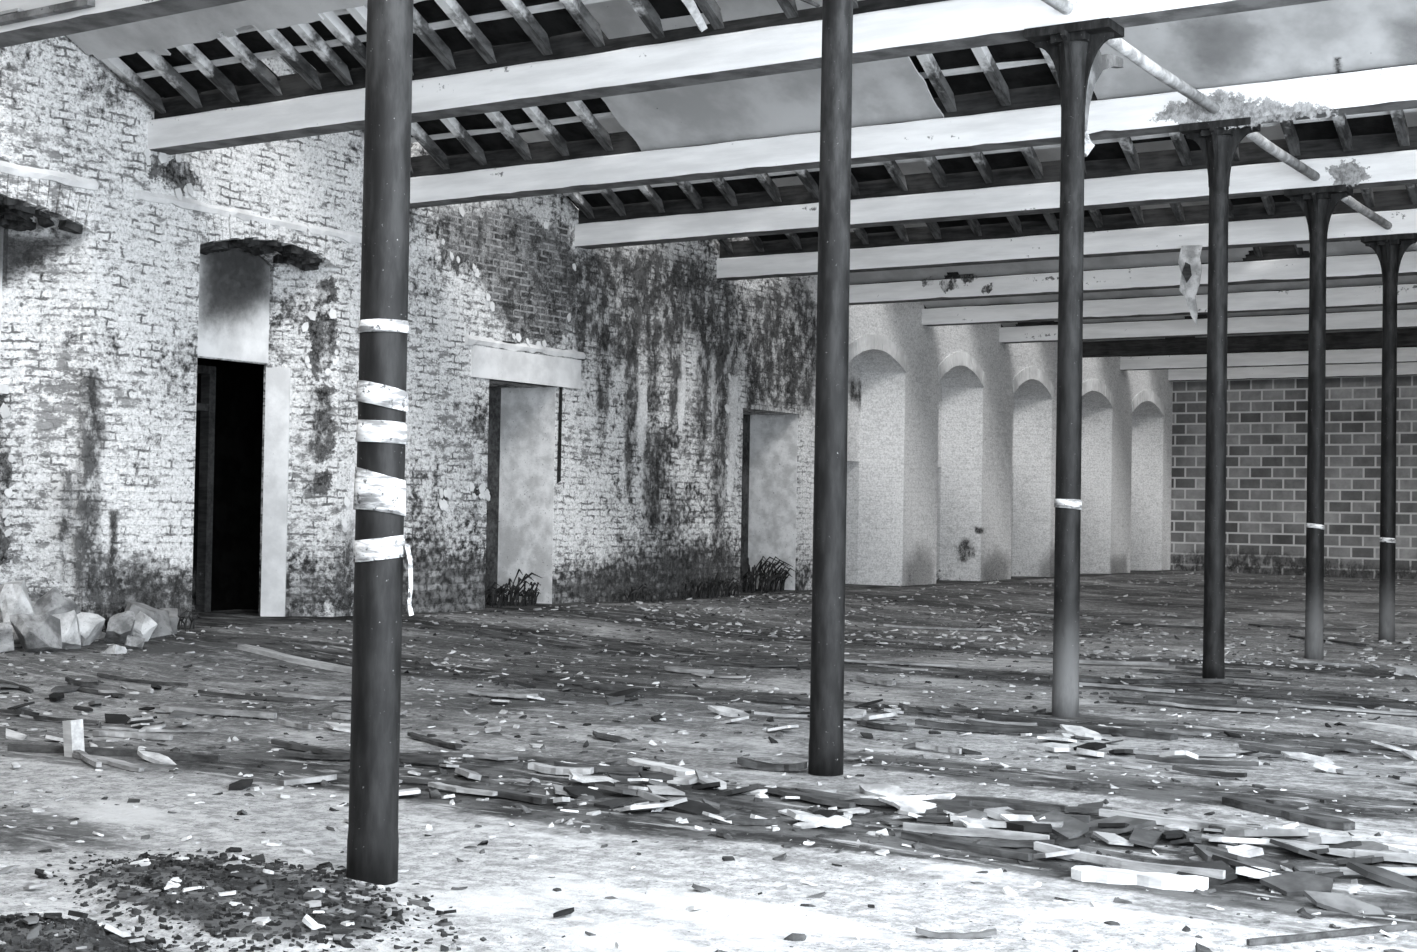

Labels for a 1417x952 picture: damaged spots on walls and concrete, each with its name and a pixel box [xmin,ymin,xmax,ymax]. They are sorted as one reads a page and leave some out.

spalling [143,148,201,200]
spalling [0,394,16,572]
spalling [200,238,357,616]